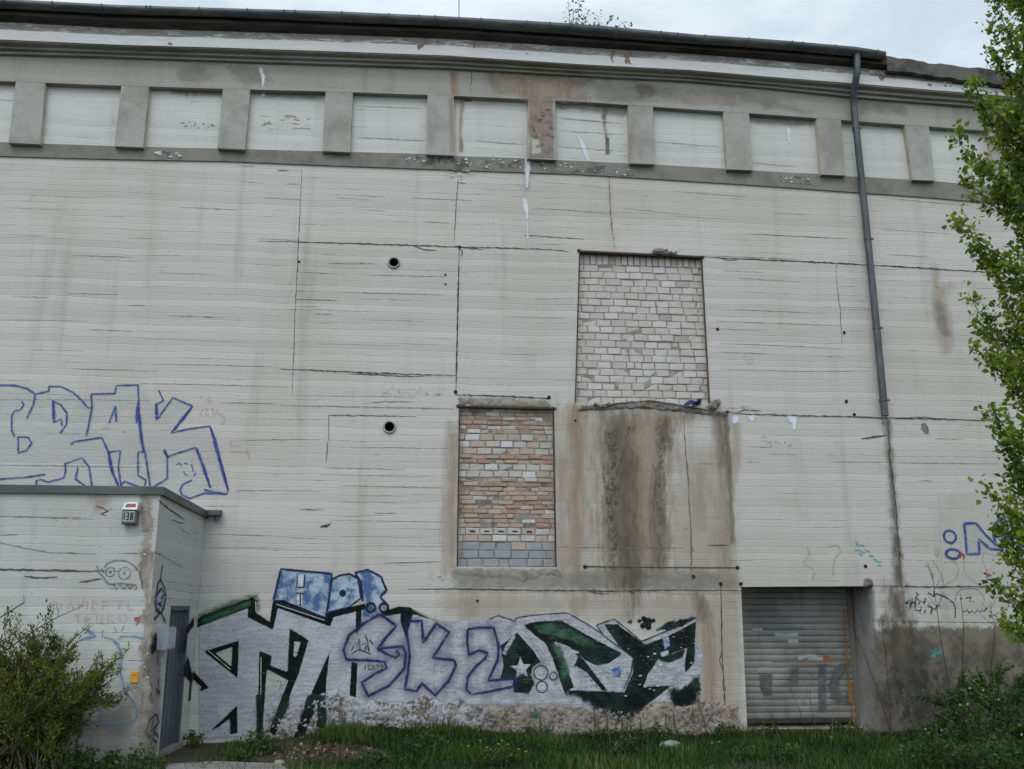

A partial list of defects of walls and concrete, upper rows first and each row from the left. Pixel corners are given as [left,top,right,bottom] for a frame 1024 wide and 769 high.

corrosion [450,91,472,151]
spalling [399,99,637,176]
leakage [522,157,530,248]
crack [0,170,579,563]
crack [699,213,992,372]
leakage [598,409,692,588]
crack [425,400,1021,702]